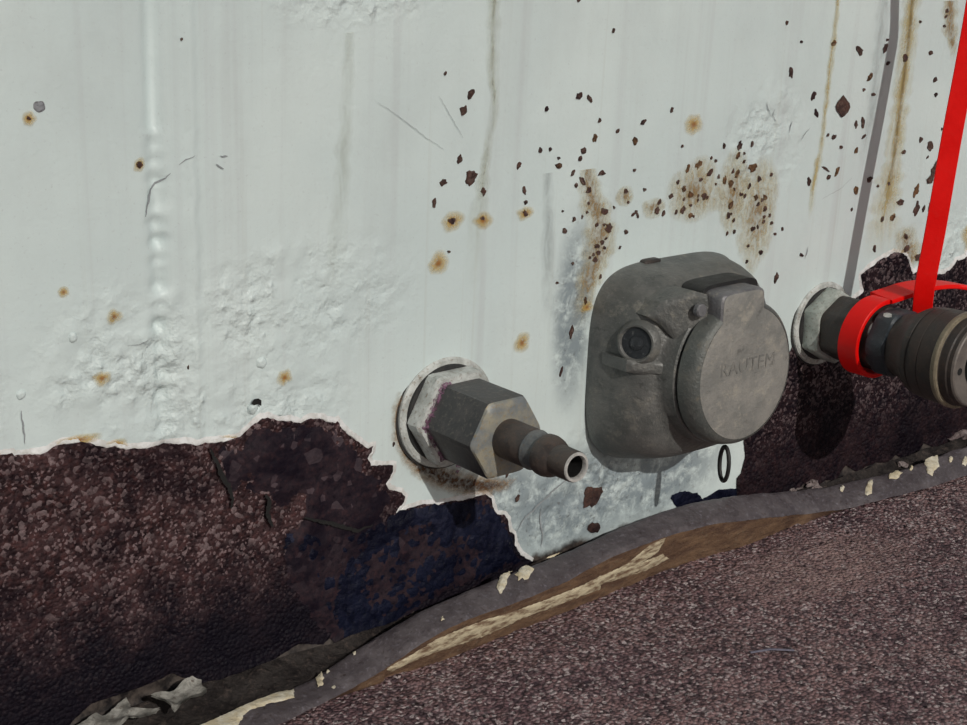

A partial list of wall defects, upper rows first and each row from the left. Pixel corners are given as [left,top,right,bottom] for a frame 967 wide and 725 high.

corrosion [946,0,955,47]
corrosion [884,0,914,216]
corrosion [432,256,445,270]
peeling [538,118,602,233]
corrosion [582,169,609,310]
peeling [588,206,628,262]
peeling [654,141,784,236]
peeling [852,233,920,300]
peeling [933,249,967,311]
corrosion [396,433,507,493]
peeling [671,347,967,507]
peeling [0,412,534,725]